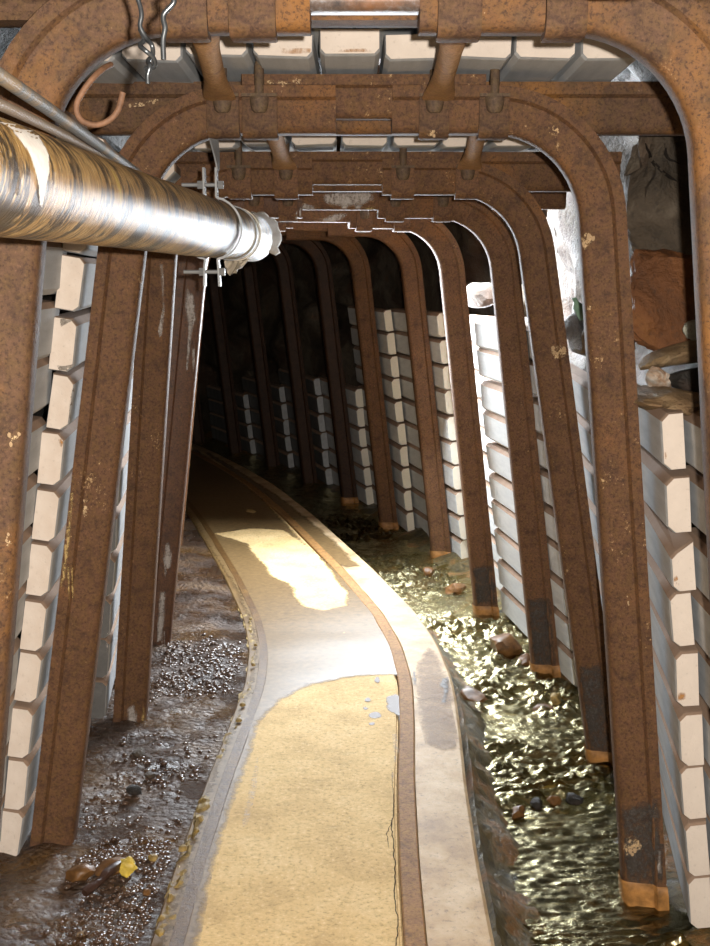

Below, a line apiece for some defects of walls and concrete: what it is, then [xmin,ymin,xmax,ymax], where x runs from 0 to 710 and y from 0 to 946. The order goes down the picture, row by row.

damp [157,593,165,642]
damp [161,450,400,946]
damp [419,650,457,749]
crack [386,776,399,945]
corrosion [623,837,642,856]